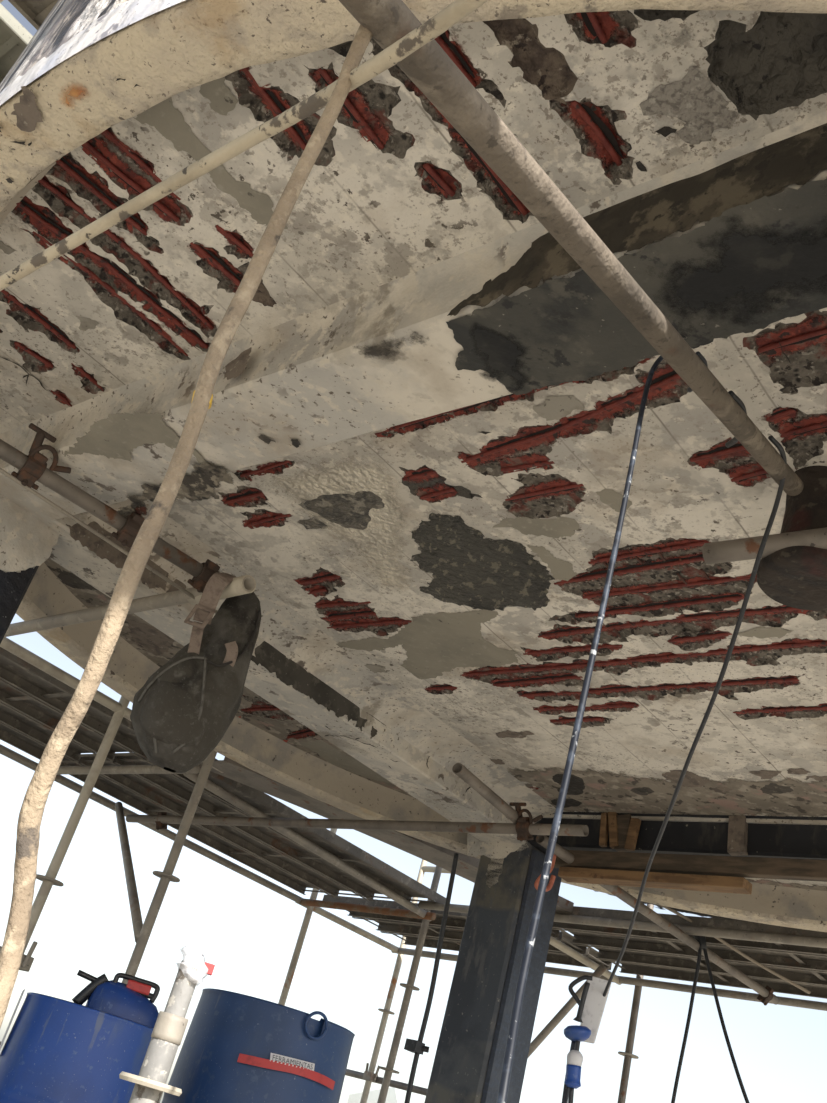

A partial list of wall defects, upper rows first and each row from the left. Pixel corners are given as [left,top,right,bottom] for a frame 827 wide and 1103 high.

spalling [11,127,162,249]
spalling [58,192,218,360]
spalling [314,64,534,224]
water stain [471,325,528,390]
water stain [447,232,581,317]
peeling [374,270,689,519]
spalling [483,18,647,185]
spalling [564,9,700,48]
water stain [583,123,827,323]
peeling [617,178,827,470]
spalling [639,11,827,144]
spalling [425,537,827,728]